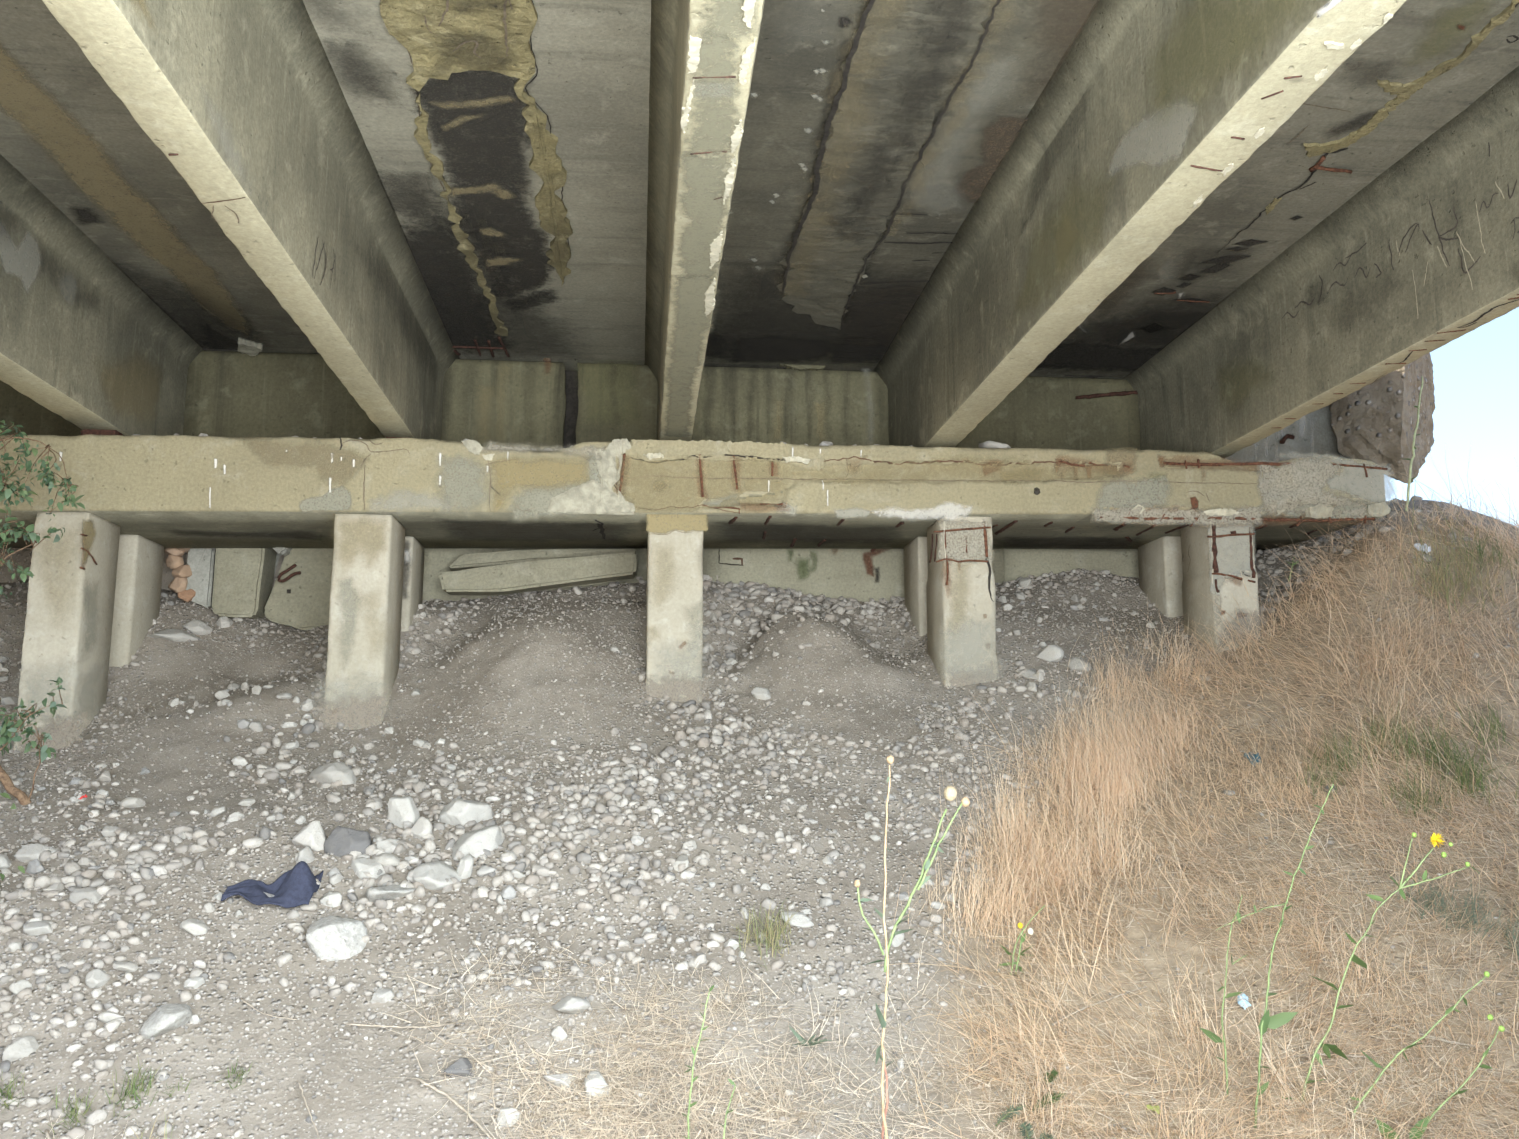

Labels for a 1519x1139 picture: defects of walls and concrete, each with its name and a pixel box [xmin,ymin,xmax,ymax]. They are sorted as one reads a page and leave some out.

crack [777,0,1001,371]
crack [1217,103,1351,253]
spalling [1309,156,1352,174]
peeling [549,0,890,535]
damp [724,258,917,357]
spalling [461,439,530,461]
spalling [1159,457,1294,482]
spalling [1332,463,1388,477]